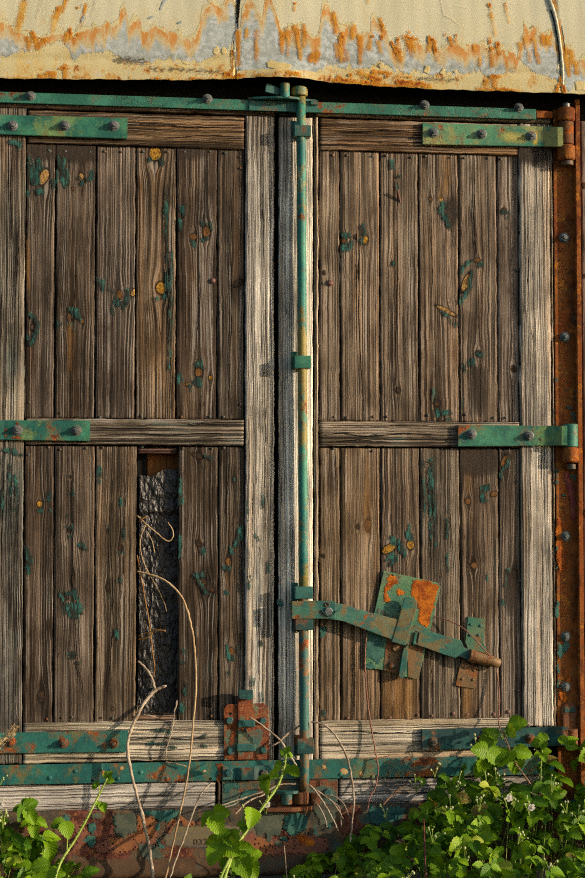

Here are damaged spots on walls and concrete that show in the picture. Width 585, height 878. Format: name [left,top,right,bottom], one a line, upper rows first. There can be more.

rust [5,64,86,79]
rust [16,0,87,49]
crack [232,0,240,59]
rust [224,28,268,79]
peeling [0,0,585,92]
rust [280,24,321,64]
rust [330,11,458,89]
rust [473,37,519,92]
rust [518,22,579,93]
crack [550,10,566,81]
rust [383,574,441,628]
rust [64,815,201,856]